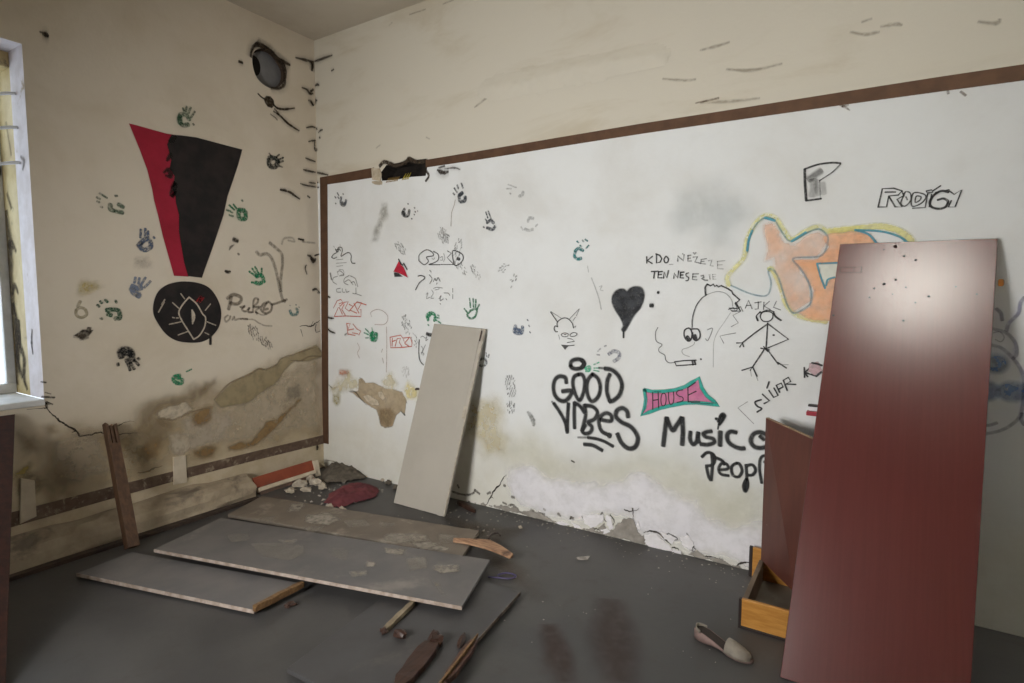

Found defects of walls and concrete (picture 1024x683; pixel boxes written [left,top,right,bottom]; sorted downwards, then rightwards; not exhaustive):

spalling [381,159,427,181]
crack [27,401,134,437]
peeling [158,402,192,419]
leakage [120,346,322,478]
peeling [352,378,407,428]
flaking render [451,484,740,568]